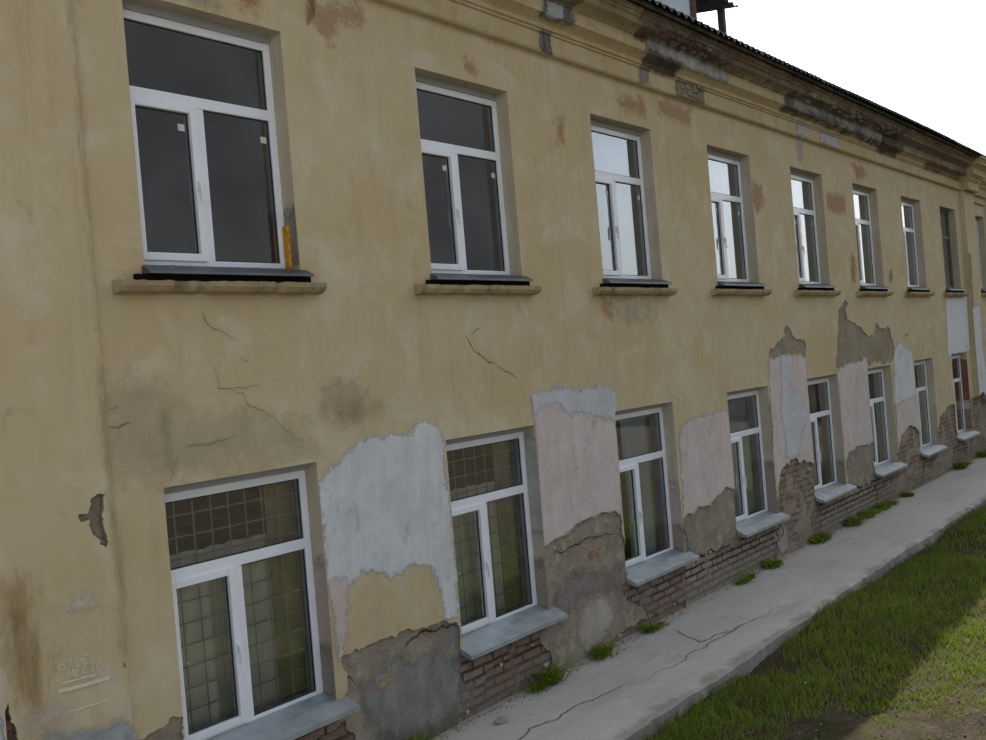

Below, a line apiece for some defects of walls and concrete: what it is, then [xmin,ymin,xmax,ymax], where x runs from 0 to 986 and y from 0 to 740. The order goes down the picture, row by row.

crack [201,310,304,441]
peeling [769,326,806,360]
peeling [836,300,894,369]
flaking render [294,359,986,740]
flaking render [5,702,18,740]
flaking render [140,716,184,740]